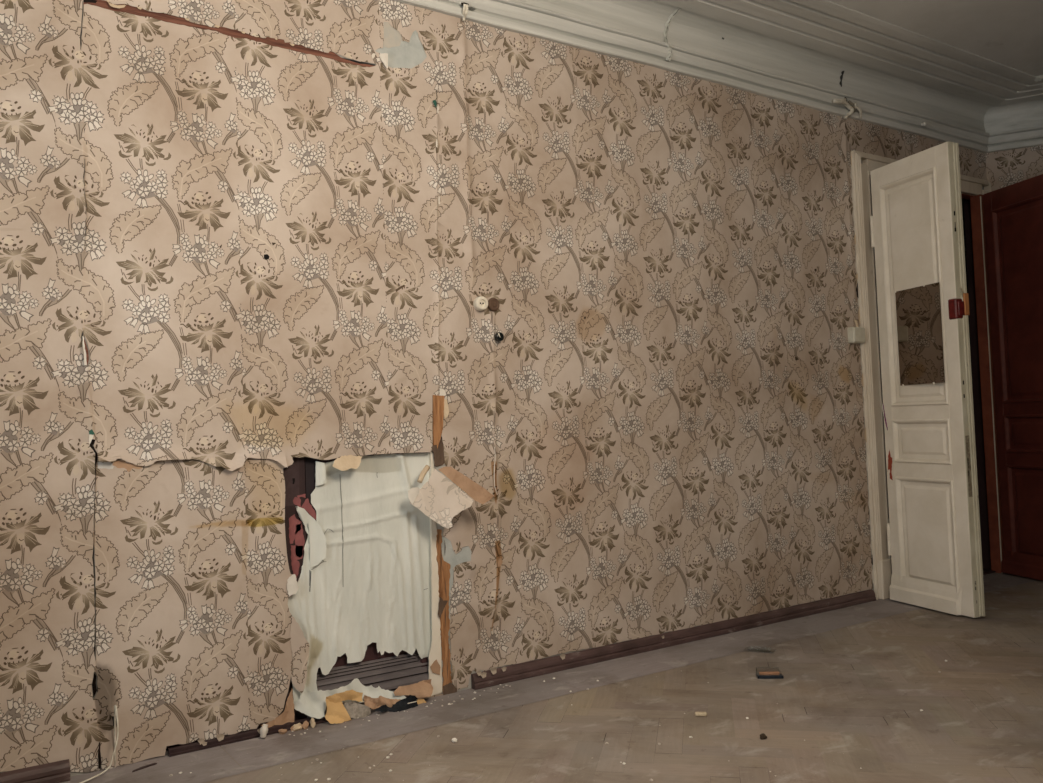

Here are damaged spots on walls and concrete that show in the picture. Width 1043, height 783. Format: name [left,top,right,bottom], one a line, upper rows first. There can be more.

peeling [372,22,427,69]
crack [81,332,89,365]
crack [89,429,97,463]
peeling [441,537,472,632]
crack [90,531,98,698]